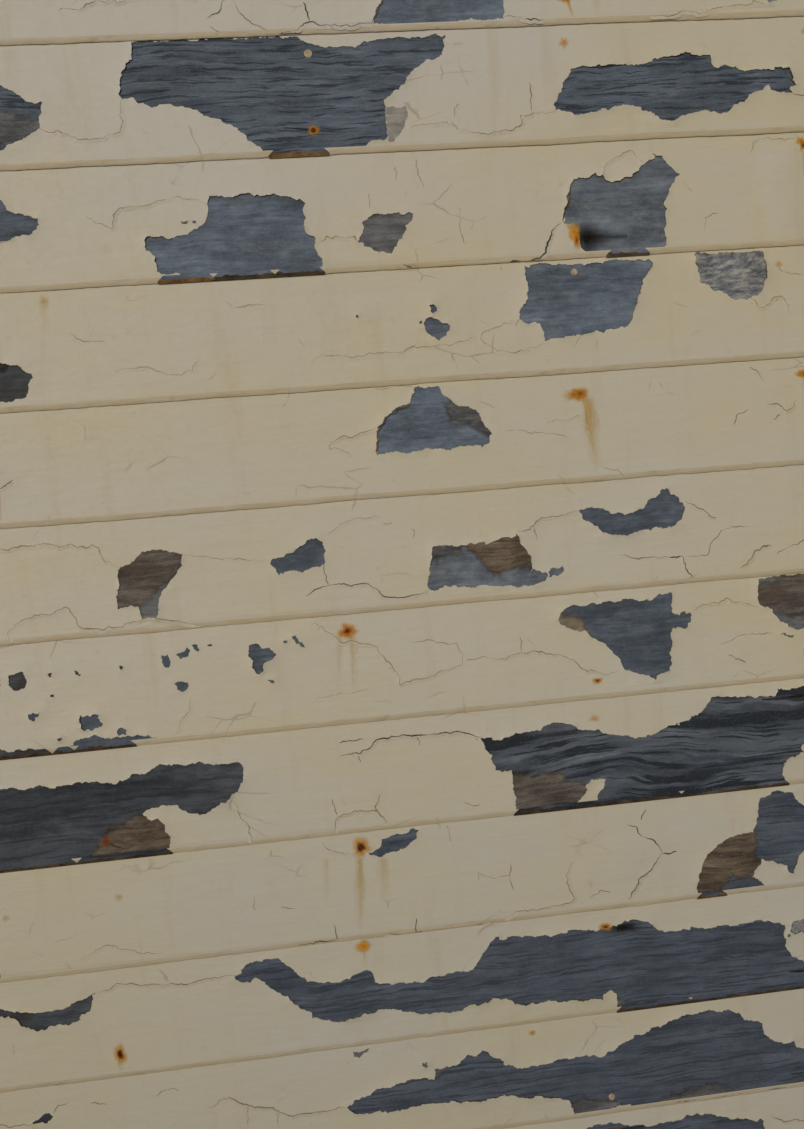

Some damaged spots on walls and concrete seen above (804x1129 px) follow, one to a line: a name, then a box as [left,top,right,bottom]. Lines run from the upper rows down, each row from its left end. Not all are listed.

crack [58,0,144,14]
crack [183,0,373,34]
peeling [119,0,504,158]
peeling [554,53,795,121]
peeling [145,193,325,284]
peeling [519,154,680,341]
rust [572,389,592,436]
peeling [0,762,243,873]
rust [356,840,368,875]
crack [384,810,676,936]
peeling [481,686,804,899]
peeling [235,919,804,1129]